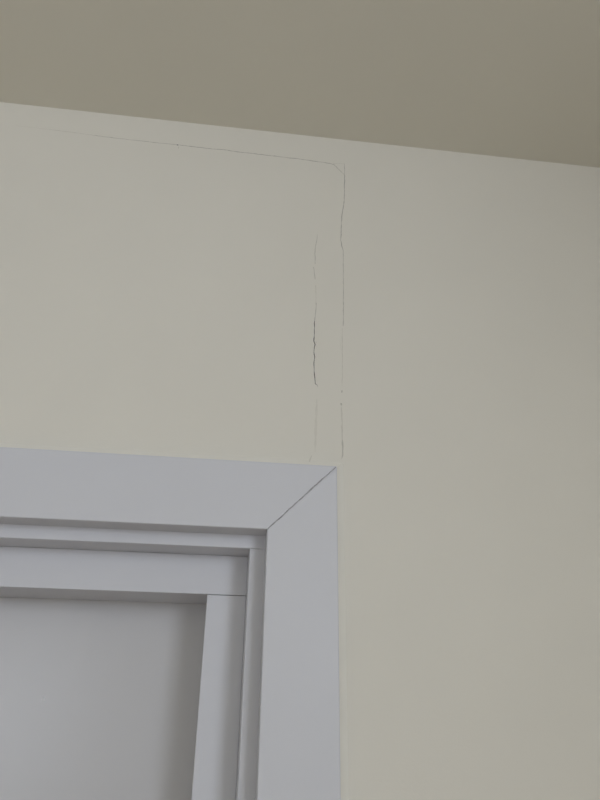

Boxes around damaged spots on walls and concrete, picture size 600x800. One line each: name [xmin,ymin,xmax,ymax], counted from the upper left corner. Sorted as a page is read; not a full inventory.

crack [22,126,345,528]